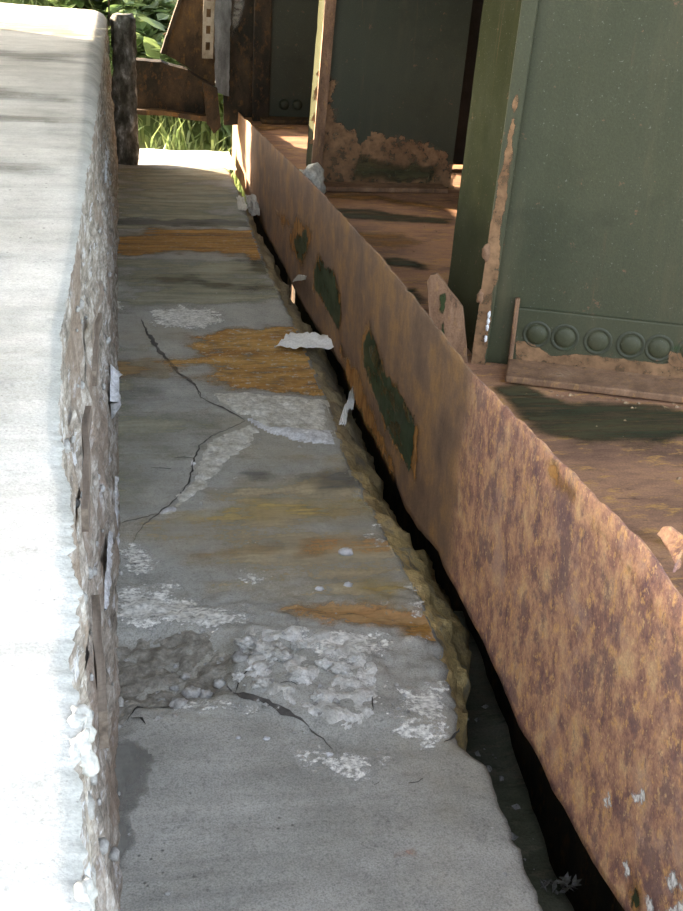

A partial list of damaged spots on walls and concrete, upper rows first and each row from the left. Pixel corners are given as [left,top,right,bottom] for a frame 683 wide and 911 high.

rust [117,228,262,261]
leakage [117,259,278,329]
spalling [238,192,312,333]
crack [122,320,244,568]
rust [339,322,418,480]
leakage [116,543,254,633]
leakage [188,469,424,618]
spalling [160,347,472,751]
rust [655,526,683,572]
crack [227,671,331,748]
leakage [386,680,449,748]
spalling [91,837,120,887]